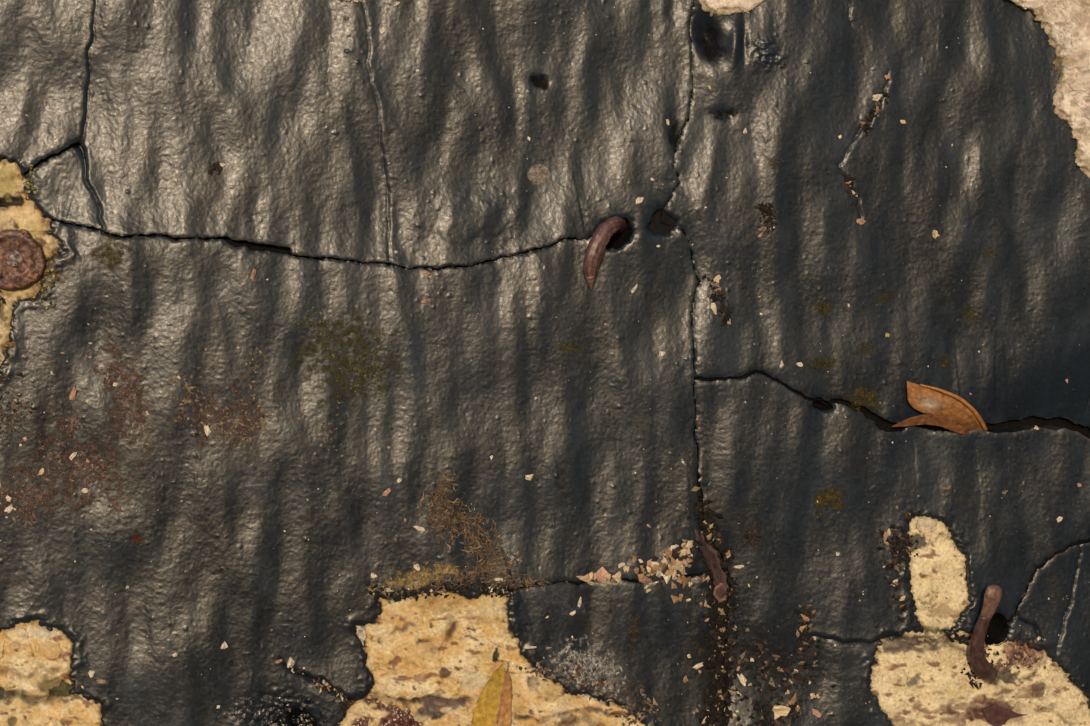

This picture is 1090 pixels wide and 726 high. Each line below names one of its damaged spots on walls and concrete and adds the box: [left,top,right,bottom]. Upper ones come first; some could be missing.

peeling [698,0,767,17]
crack [23,3,591,270]
peeling [1006,0,1090,178]
peeling [0,157,61,357]
crack [661,209,948,502]
crack [985,416,1090,439]
peeling [0,620,102,726]
peeling [338,589,645,726]
crack [621,568,727,618]
crack [811,634,905,644]
peeling [870,516,1090,726]
crack [1003,538,1090,652]